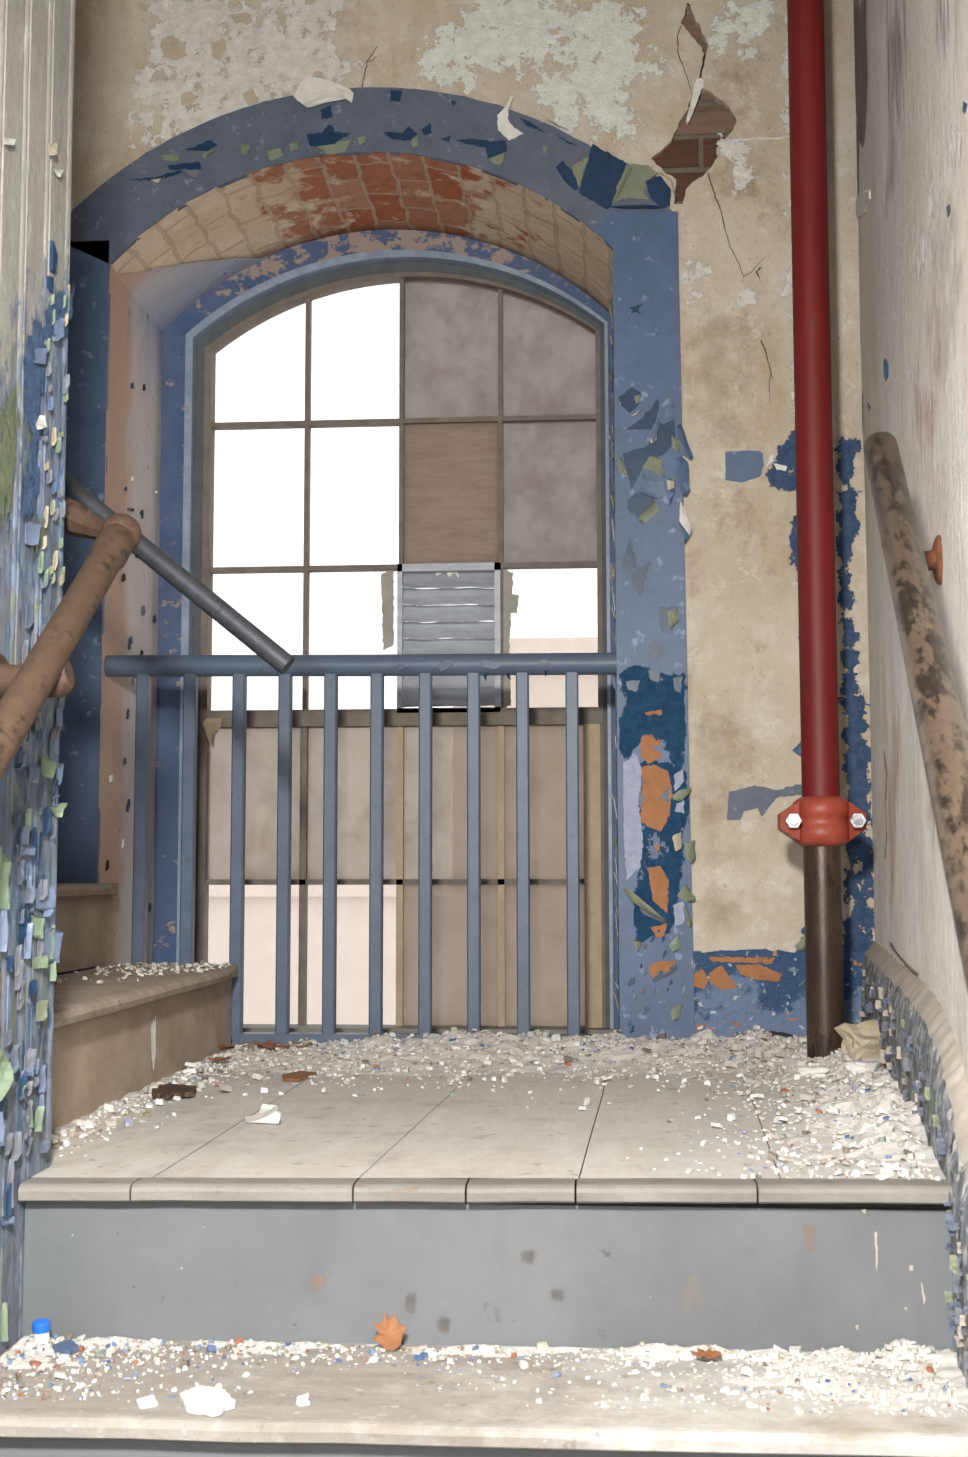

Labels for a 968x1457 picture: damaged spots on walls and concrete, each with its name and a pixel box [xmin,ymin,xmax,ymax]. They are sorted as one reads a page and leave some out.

peeling [48,143,64,177]
peeling [128,0,736,210]
peeling [853,0,871,217]
crack [708,172,765,278]
peeling [0,241,76,663]
peeling [725,429,796,492]
peeling [789,515,798,581]
peeling [834,396,875,952]
peeling [727,784,802,820]
peeling [0,697,68,1226]
peeling [794,927,805,953]